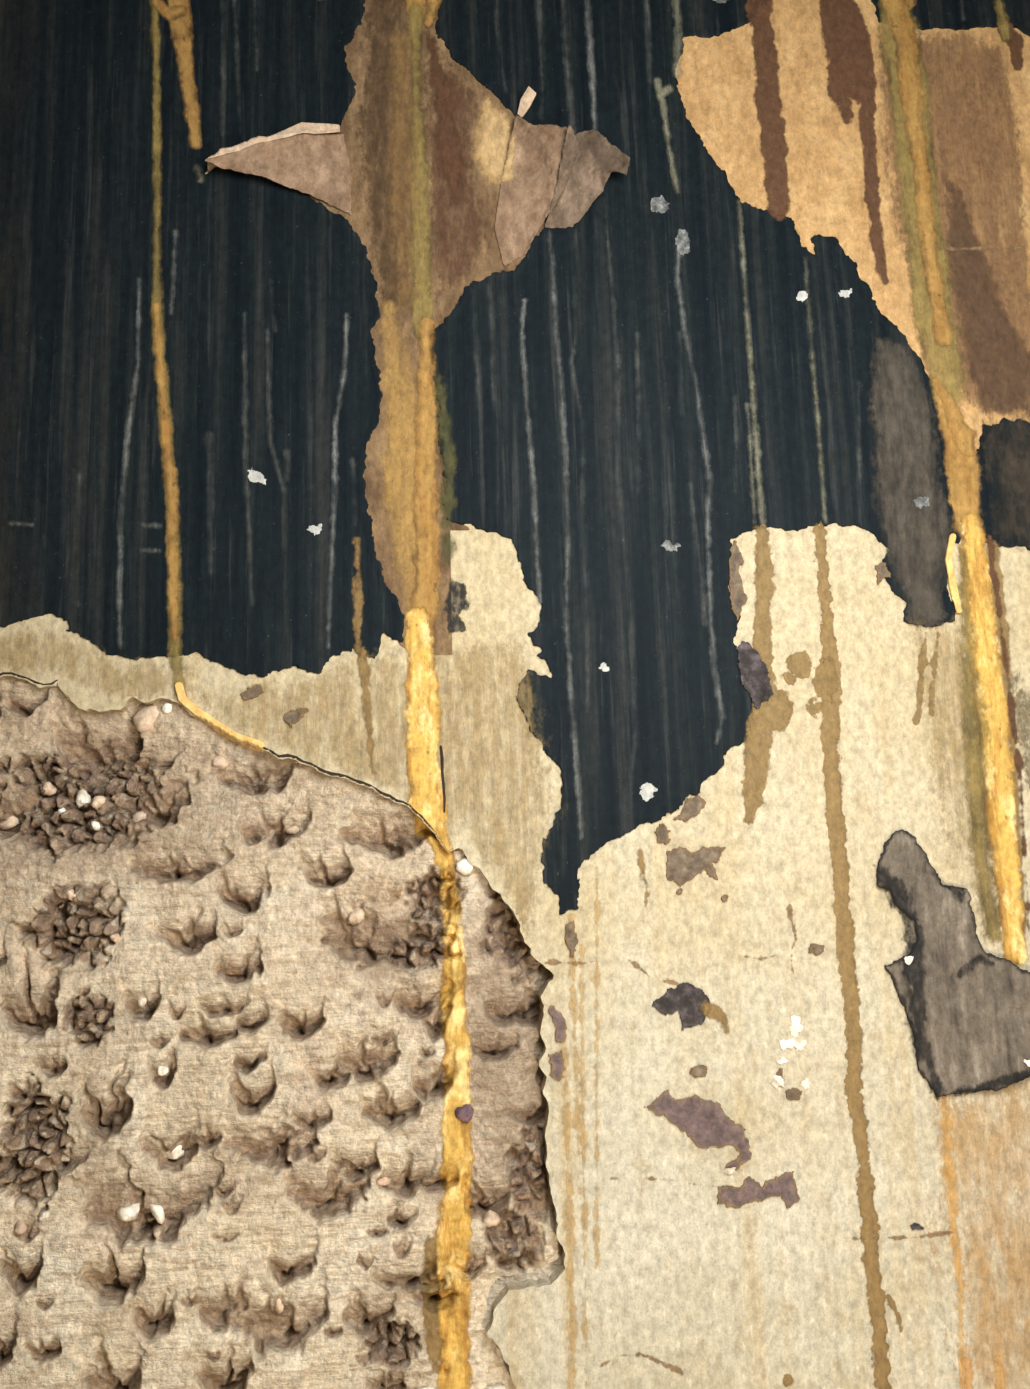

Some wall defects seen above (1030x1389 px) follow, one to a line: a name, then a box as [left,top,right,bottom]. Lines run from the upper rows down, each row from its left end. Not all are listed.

corrosion [150,0,264,753]
corrosion [352,537,376,774]
peeling [205,0,630,655]
corrosion [382,0,475,1389]
peeling [639,782,658,802]
peeling [675,22,769,210]
water stain [745,0,790,221]
peeling [769,0,934,387]
water stain [820,0,912,284]
corrosion [878,0,1030,966]
peeling [915,27,1030,315]
water stain [917,20,1030,416]